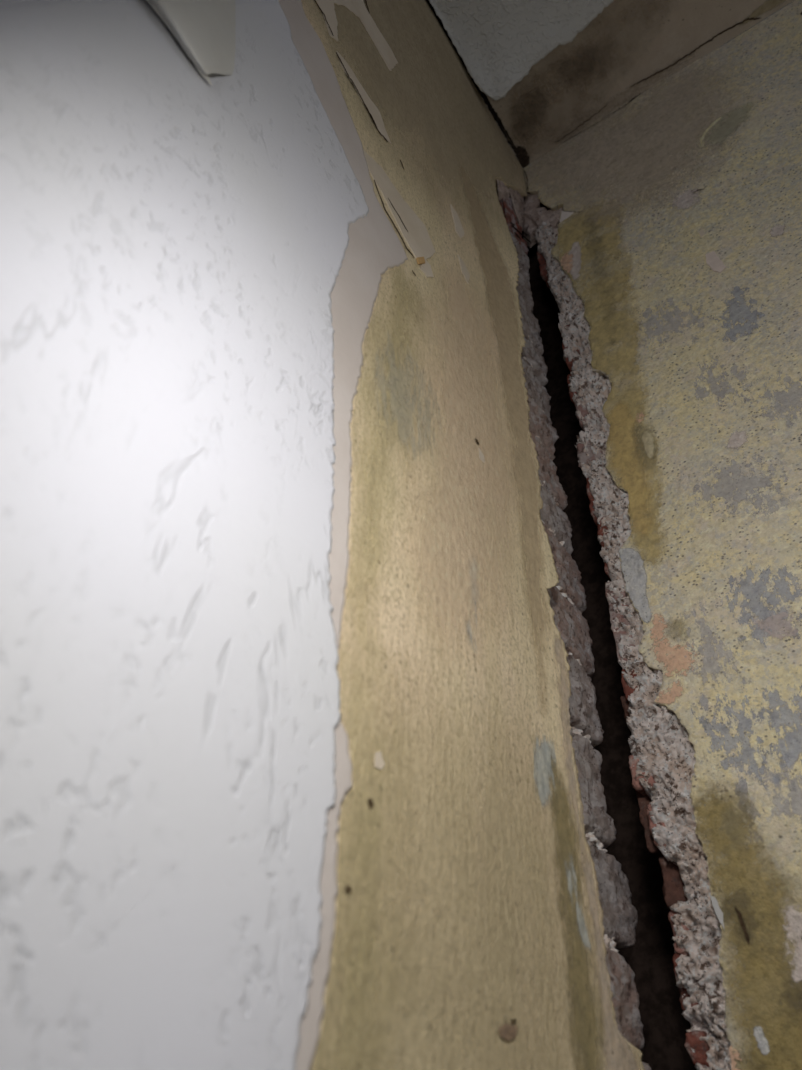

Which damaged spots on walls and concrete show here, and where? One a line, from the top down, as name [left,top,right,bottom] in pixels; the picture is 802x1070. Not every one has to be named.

crack [426,0,760,1070]
leakage [526,71,732,563]
leakage [695,789,802,1070]